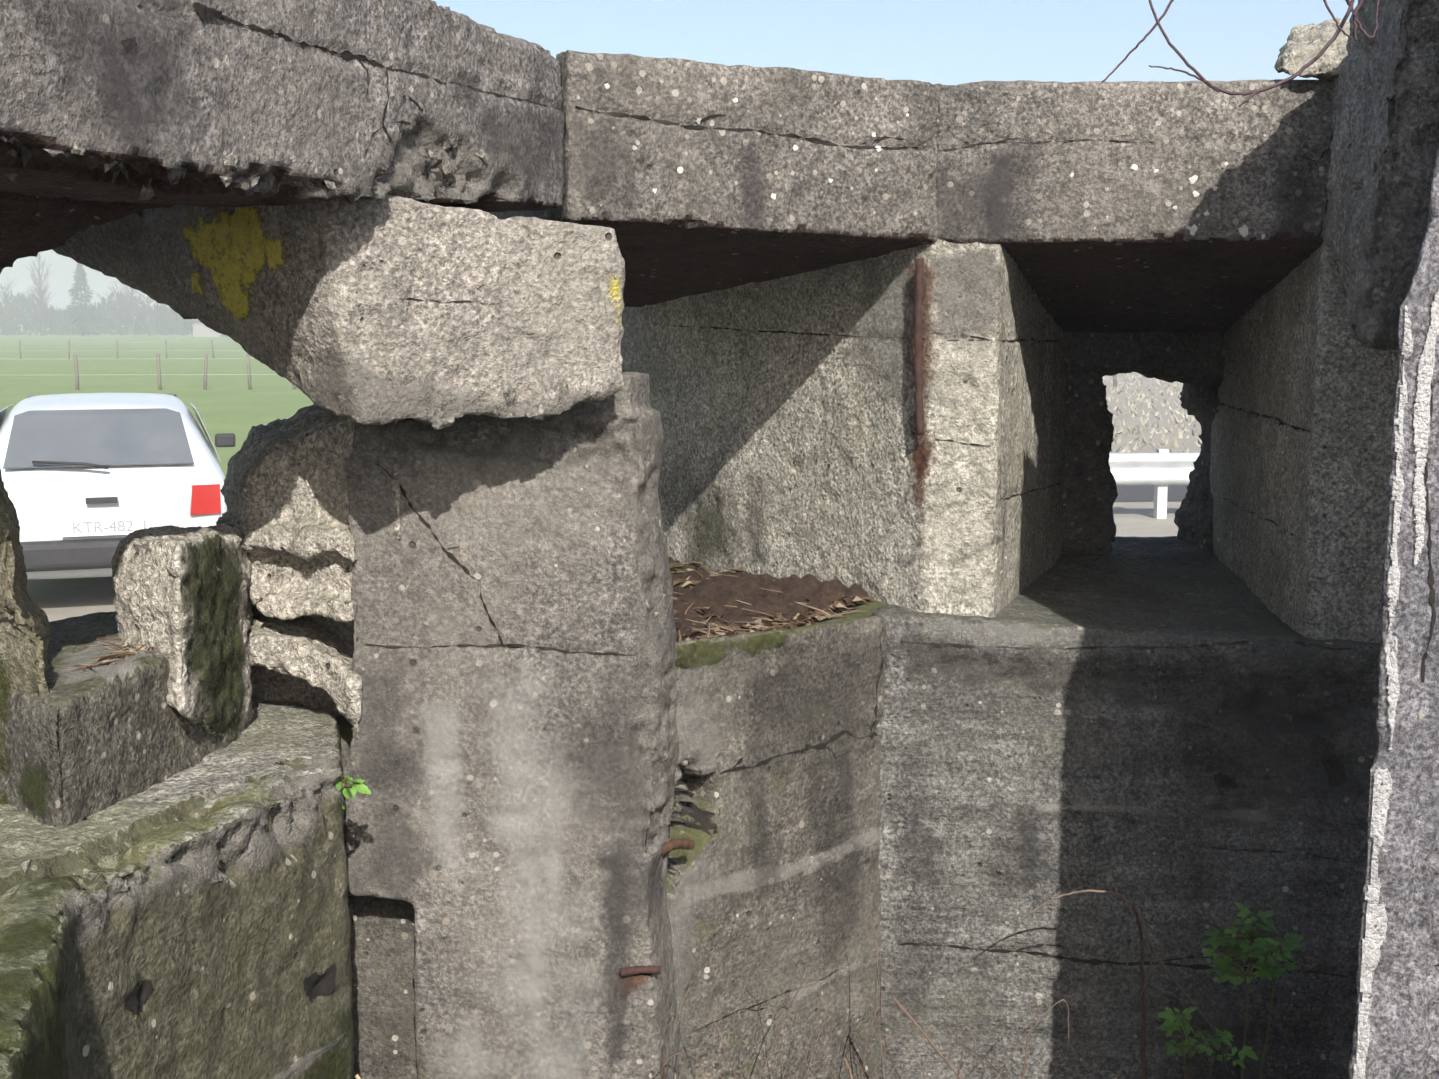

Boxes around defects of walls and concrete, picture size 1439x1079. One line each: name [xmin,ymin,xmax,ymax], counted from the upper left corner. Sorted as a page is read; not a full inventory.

spalling [71,139,87,156]
rust [903,266,933,392]
rust [911,422,931,503]
crack [355,463,637,658]
crack [708,629,1351,774]
crack [899,943,1348,978]